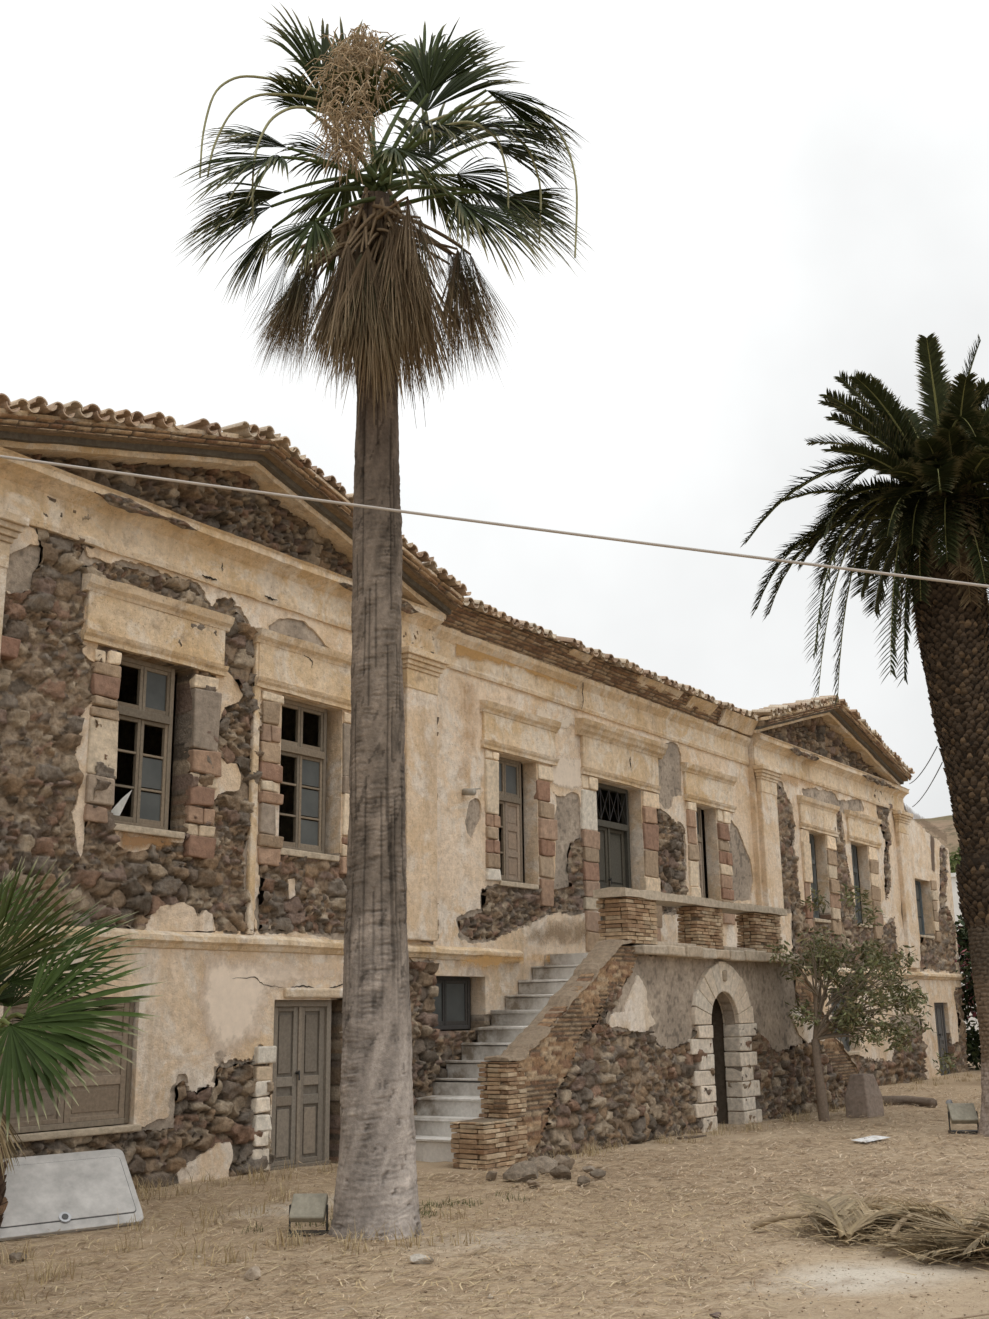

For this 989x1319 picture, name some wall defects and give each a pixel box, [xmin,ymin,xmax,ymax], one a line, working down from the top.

peeling [5,527,40,594]
flaking render [79,545,209,604]
peeling [80,606,98,663]
peeling [214,671,243,720]
peeling [71,702,93,857]
peeling [214,751,241,800]
peeling [144,840,344,940]
flaking render [456,884,583,944]
flaking render [84,1050,268,1134]
peeling [175,1142,233,1184]